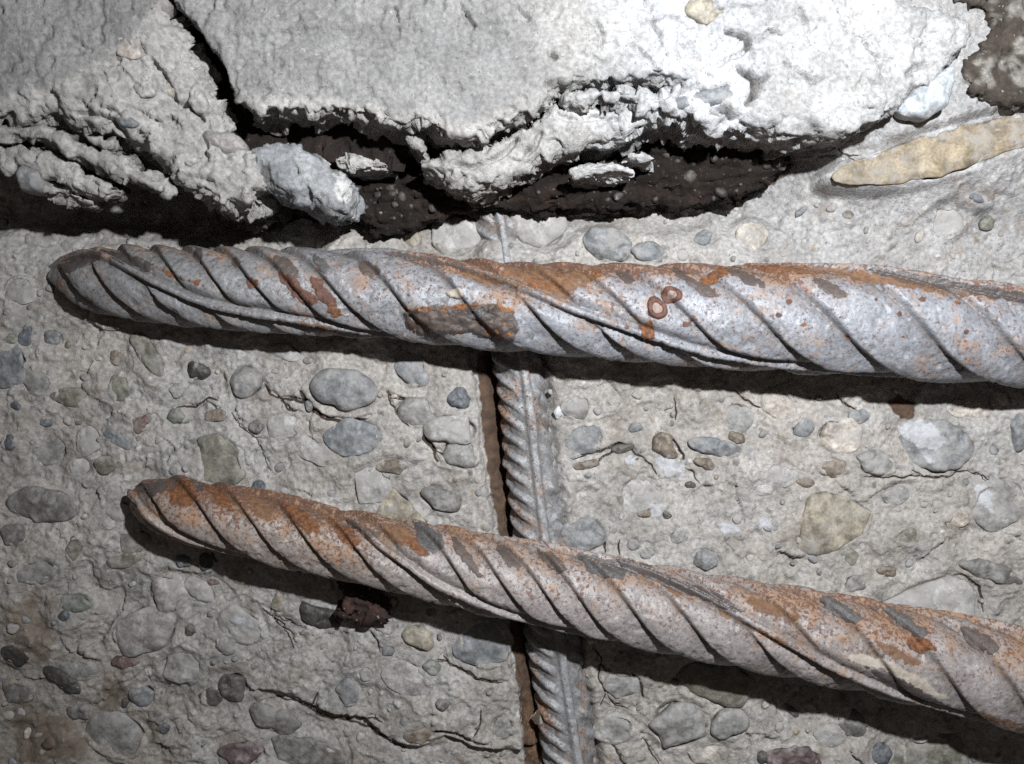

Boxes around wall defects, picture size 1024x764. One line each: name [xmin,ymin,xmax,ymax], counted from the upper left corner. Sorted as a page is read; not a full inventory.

spalling [0,124,183,212]
crack [828,148,859,161]
rust [279,271,348,332]
rust [404,287,519,341]
rust [625,286,683,342]
peeling [870,266,1024,303]
rust [477,351,514,537]
peeling [413,520,483,577]
peeling [577,552,745,613]
crack [276,692,406,748]
rust [510,621,544,764]
peeling [865,666,945,705]